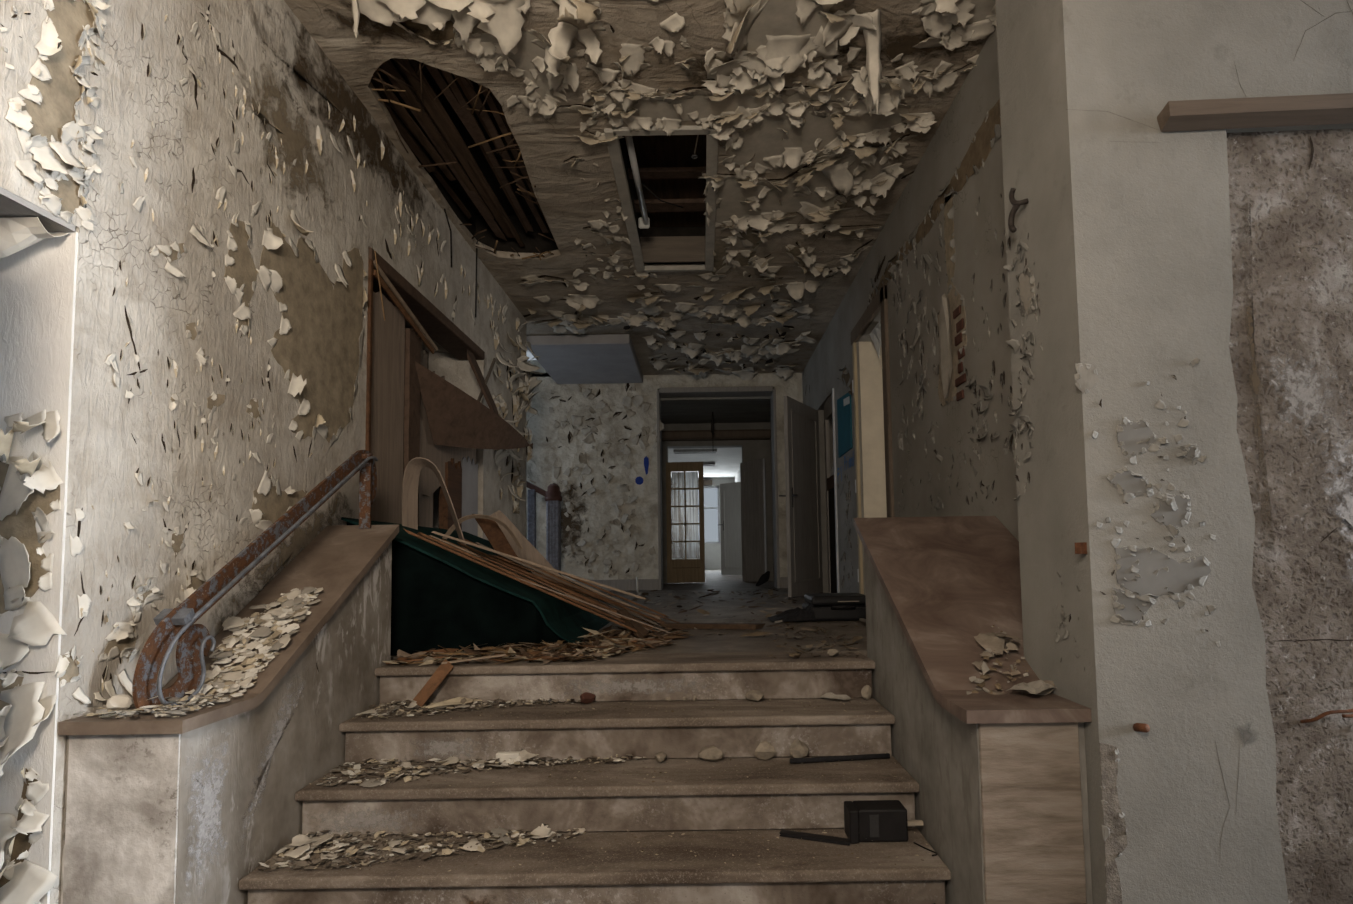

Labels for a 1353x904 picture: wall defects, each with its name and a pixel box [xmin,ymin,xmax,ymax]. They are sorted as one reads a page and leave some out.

peeling [0,0,368,777]
peeling [351,0,997,577]
spalling [871,94,1043,500]
spalling [1074,363,1102,408]
peeling [1096,381,1221,647]
peeling [0,767,58,904]